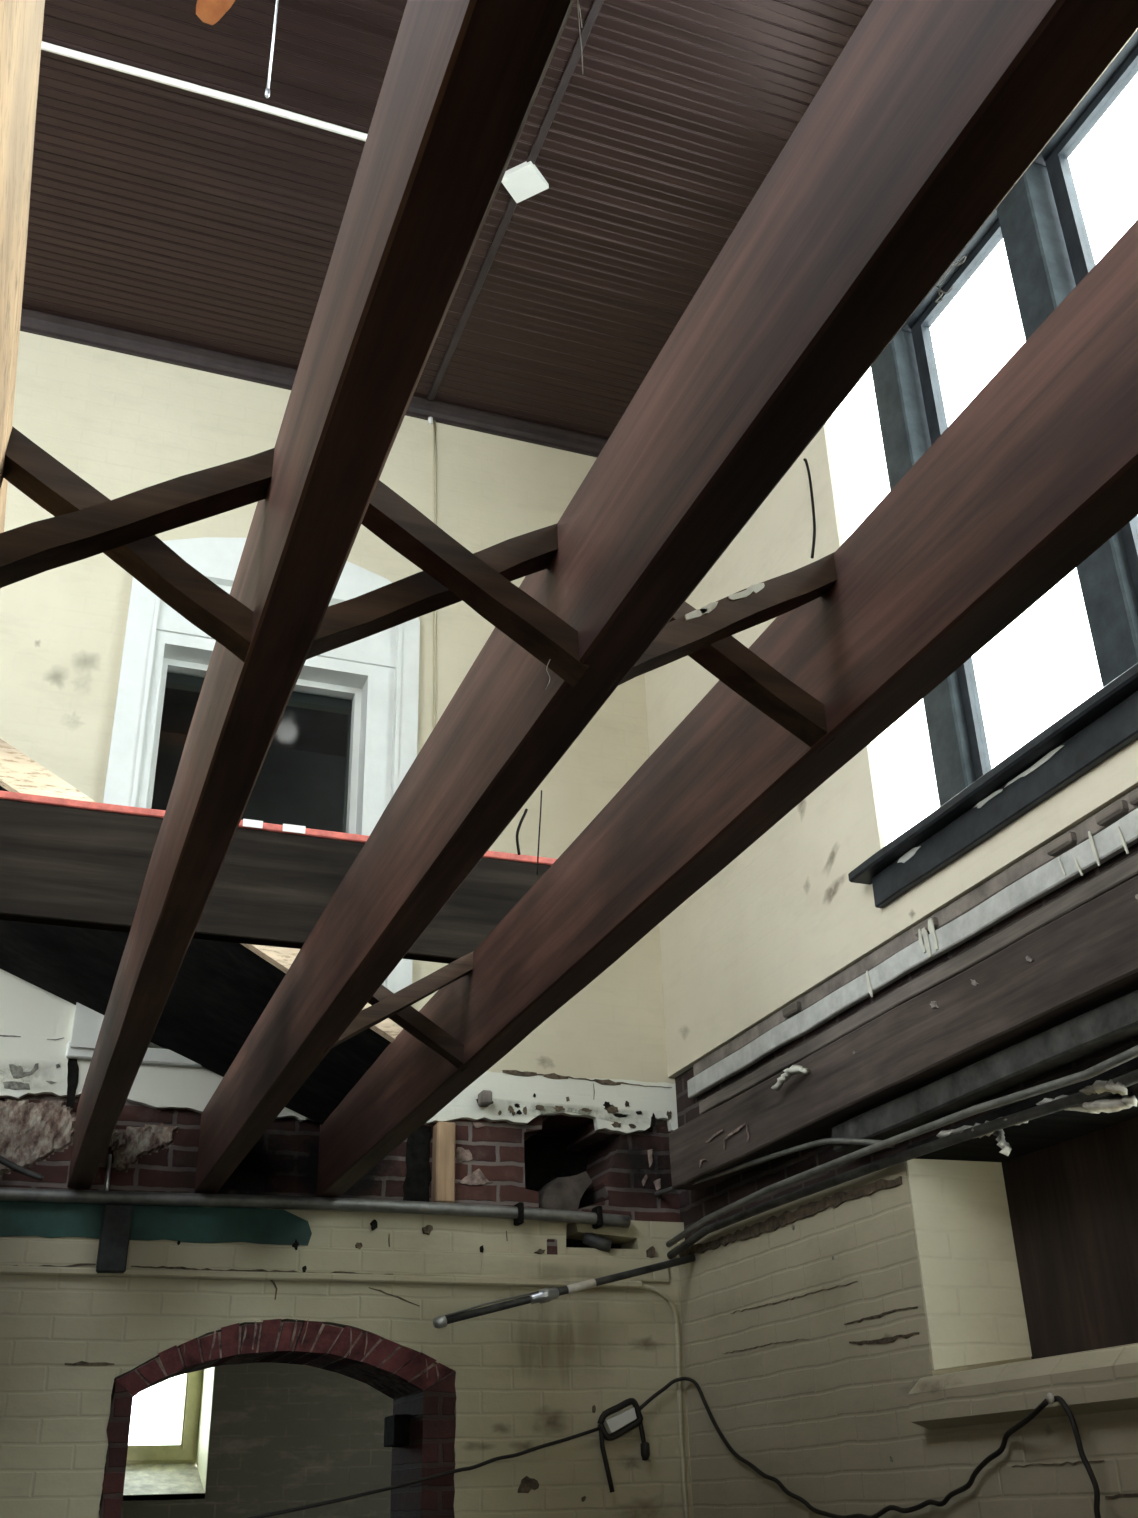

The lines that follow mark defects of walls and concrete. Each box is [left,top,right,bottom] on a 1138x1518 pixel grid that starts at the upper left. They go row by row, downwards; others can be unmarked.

spalling [0,1063,77,1174]
peeling [476,1093,672,1128]
spalling [524,1135,592,1210]
crack [732,1281,919,1345]
crack [722,1338,805,1354]